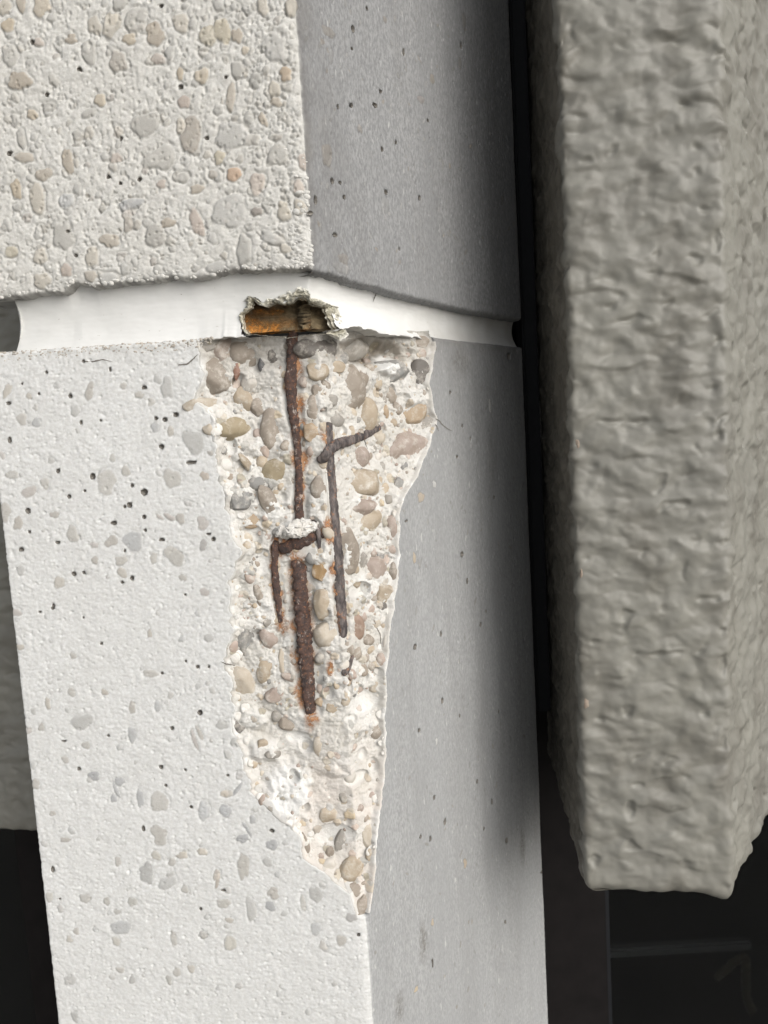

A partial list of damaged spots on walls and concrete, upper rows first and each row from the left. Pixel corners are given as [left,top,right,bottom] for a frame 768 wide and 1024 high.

rust [242,309,316,335]
spalling [0,331,438,916]
rust [269,537,304,634]
rust [292,651,319,727]